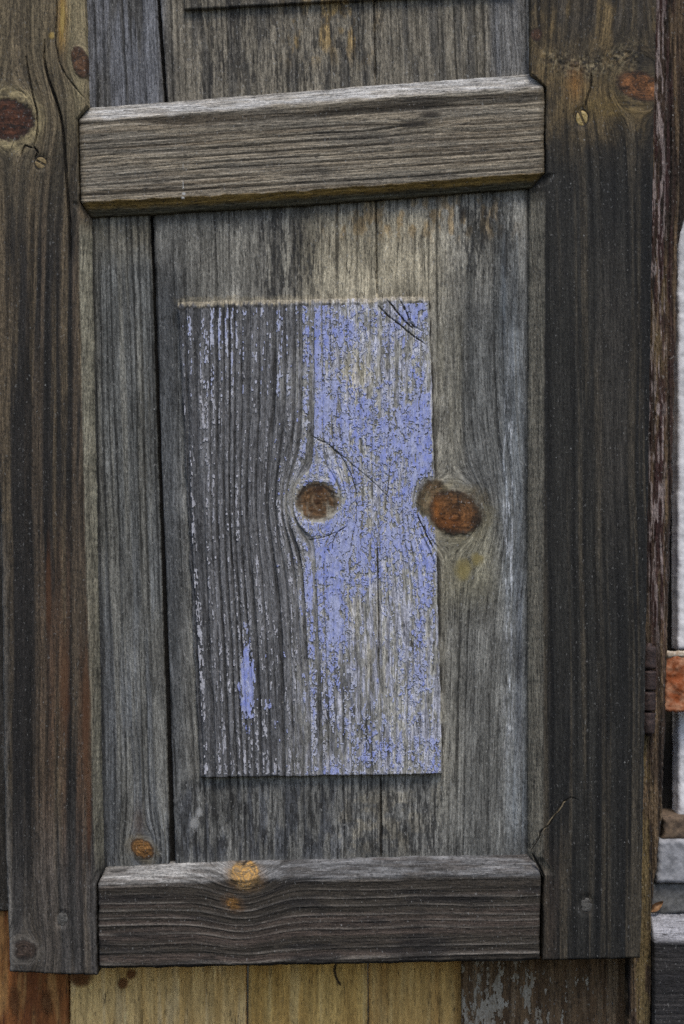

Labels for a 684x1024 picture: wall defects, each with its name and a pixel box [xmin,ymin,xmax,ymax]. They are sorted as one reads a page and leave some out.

crack [375,203,422,342]
peeling [183,303,441,775]
crack [374,548,382,660]
crack [377,781,385,853]
crack [531,797,576,878]